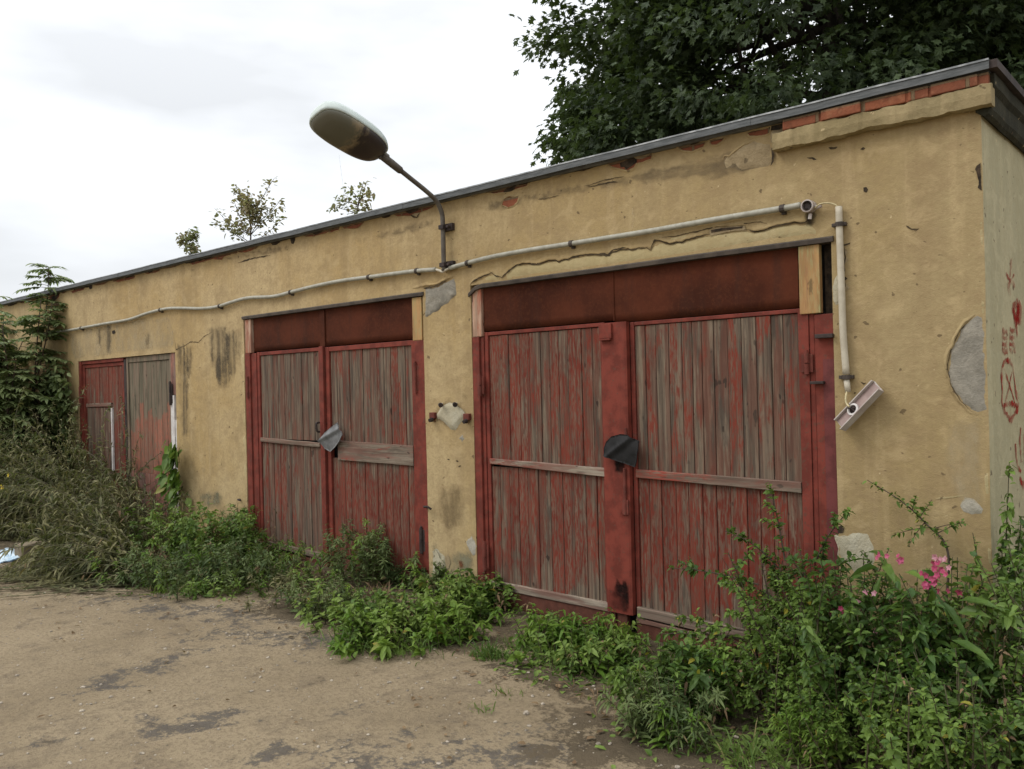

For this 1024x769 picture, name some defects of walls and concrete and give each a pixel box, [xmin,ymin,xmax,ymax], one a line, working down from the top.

flaking render [676,123,783,171]
flaking render [470,182,530,209]
crack [744,216,807,232]
crack [424,227,713,289]
water stain [211,332,234,384]